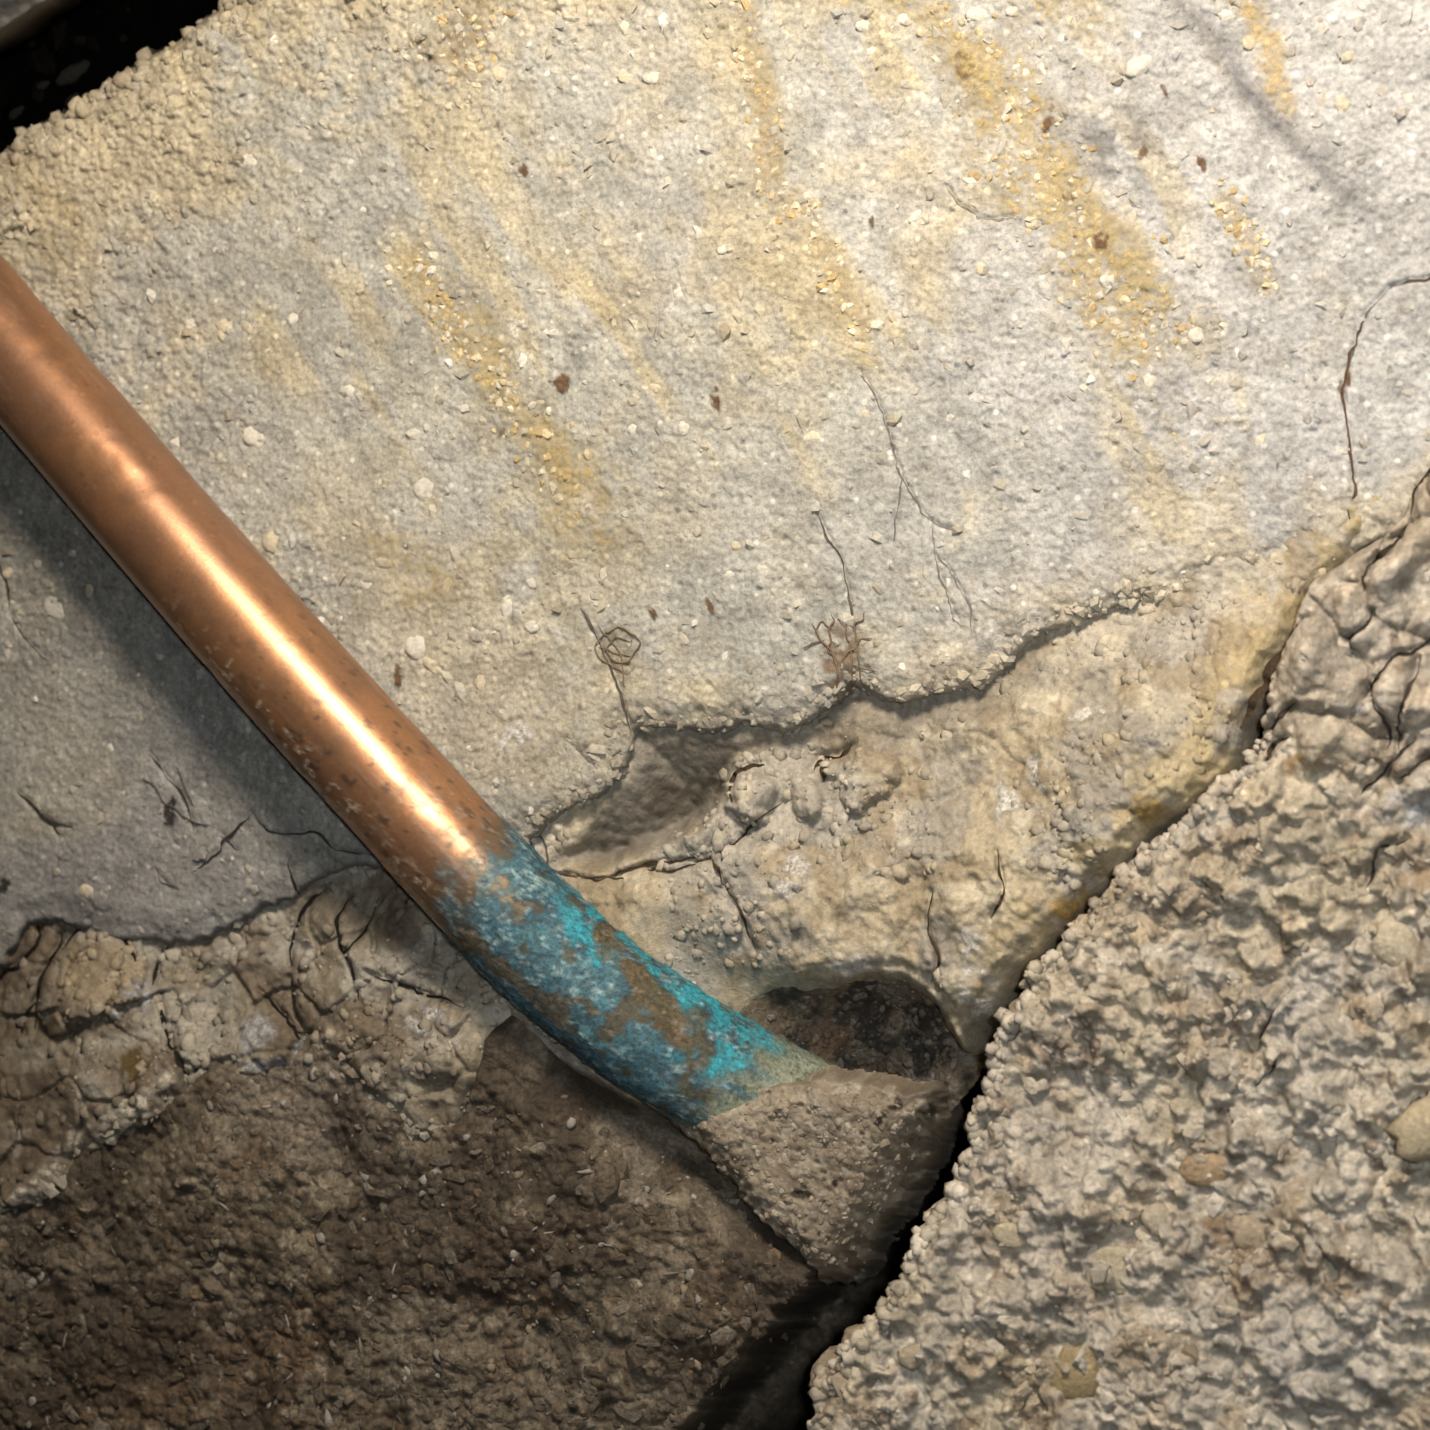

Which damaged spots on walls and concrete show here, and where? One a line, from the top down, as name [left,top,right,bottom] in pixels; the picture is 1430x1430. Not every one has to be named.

crack [1340,277,1430,520]
crack [816,513,853,628]
crack [1347,468,1430,795]
crack [1240,630,1295,761]
crack [814,744,852,782]
crack [18,793,72,835]
spalling [79,884,93,899]
crack [151,757,466,1042]
leakage [776,853,811,899]
leakage [807,955,881,986]
crack [927,892,941,983]
crack [990,850,1005,918]